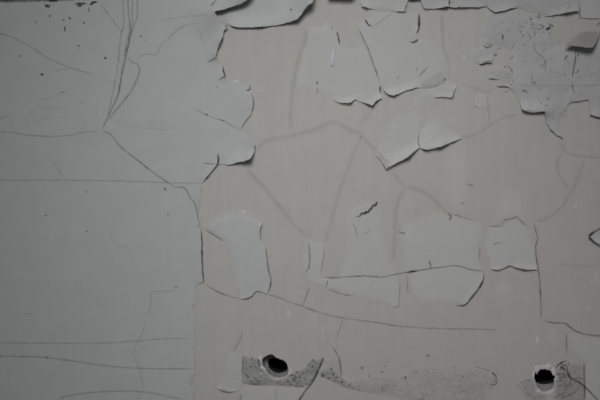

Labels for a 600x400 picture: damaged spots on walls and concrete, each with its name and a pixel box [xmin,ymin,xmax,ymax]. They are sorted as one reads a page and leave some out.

peeling [295,0,600,138]
peeling [0,0,313,400]
peeling [378,110,461,167]
peeling [327,183,537,307]
flaking render [218,350,497,400]
peeling [515,332,600,400]